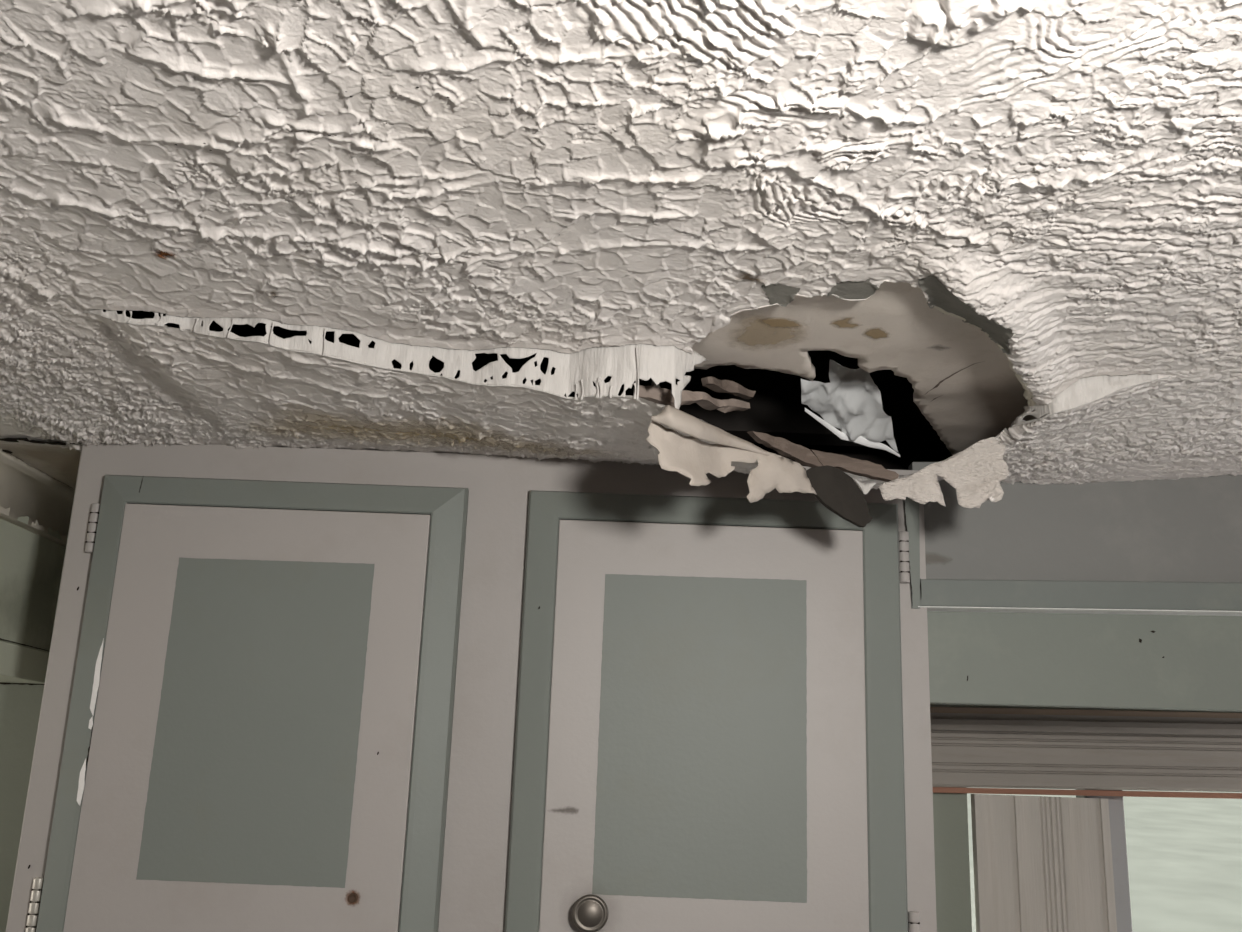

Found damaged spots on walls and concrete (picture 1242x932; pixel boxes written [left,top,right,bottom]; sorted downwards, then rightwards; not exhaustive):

peeling [761,283,800,307]
peeling [827,279,879,301]
peeling [918,275,1014,355]
leakage [738,319,799,346]
leakage [832,318,887,339]
peeling [853,478,876,494]